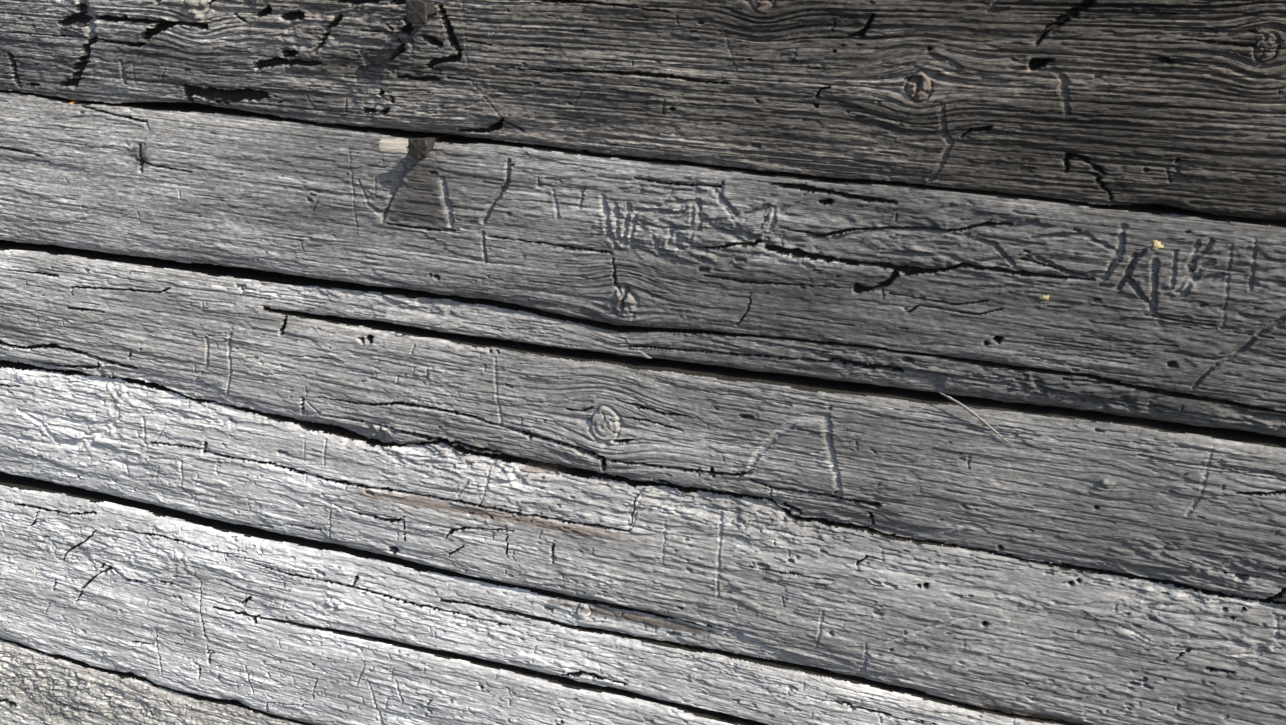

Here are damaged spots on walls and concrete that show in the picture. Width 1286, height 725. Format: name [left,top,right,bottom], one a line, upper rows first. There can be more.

crack [1,0,216,47]
crack [1035,0,1095,45]
crack [696,183,1096,316]
crack [1144,314,1214,325]